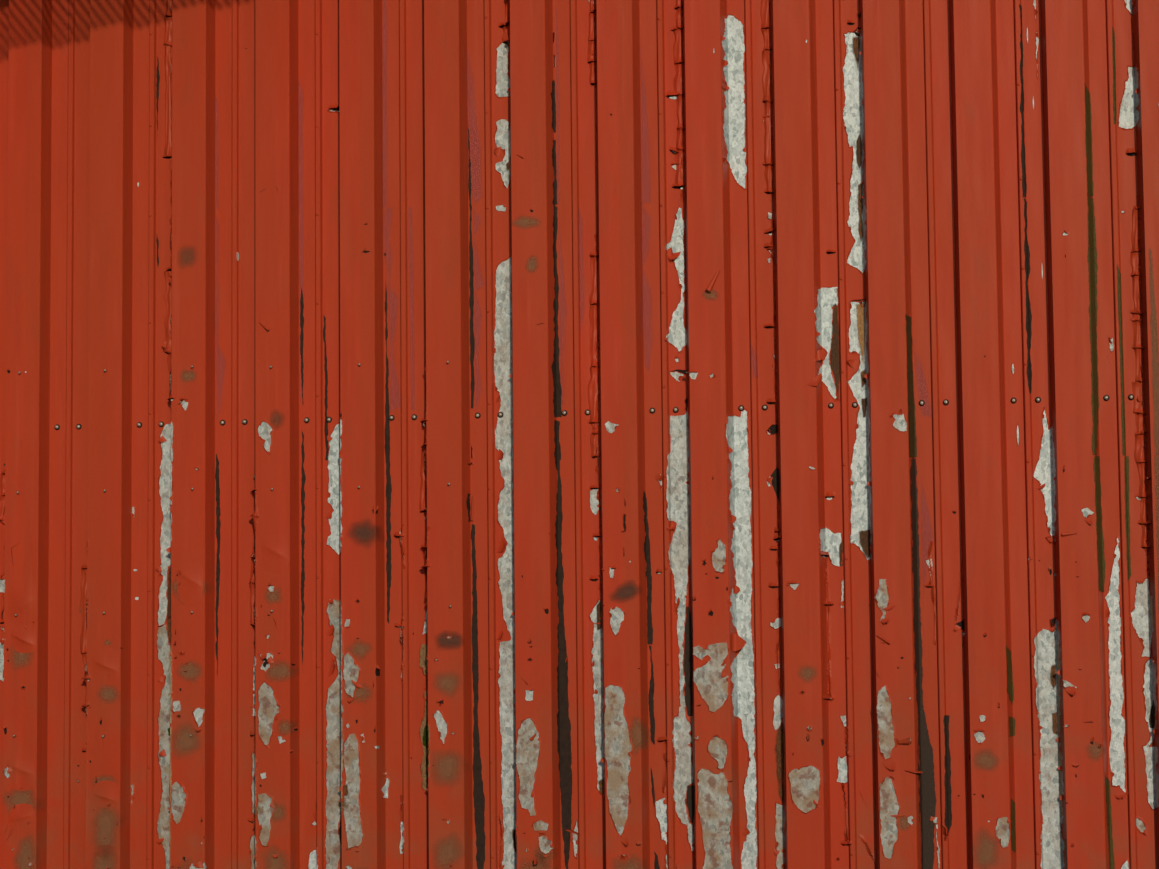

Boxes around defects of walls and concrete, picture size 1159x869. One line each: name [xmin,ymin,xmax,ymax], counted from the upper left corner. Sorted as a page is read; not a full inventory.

peeling [713,14,748,191]
peeling [841,26,868,275]
peeling [664,206,716,382]
peeling [156,420,209,869]
peeling [307,597,381,869]
peeling [492,255,554,869]
peeling [589,597,641,860]
peeling [654,403,759,869]
peeling [808,286,873,608]
peeling [876,684,923,860]
peeling [1033,407,1077,542]
peeling [1032,534,1159,869]